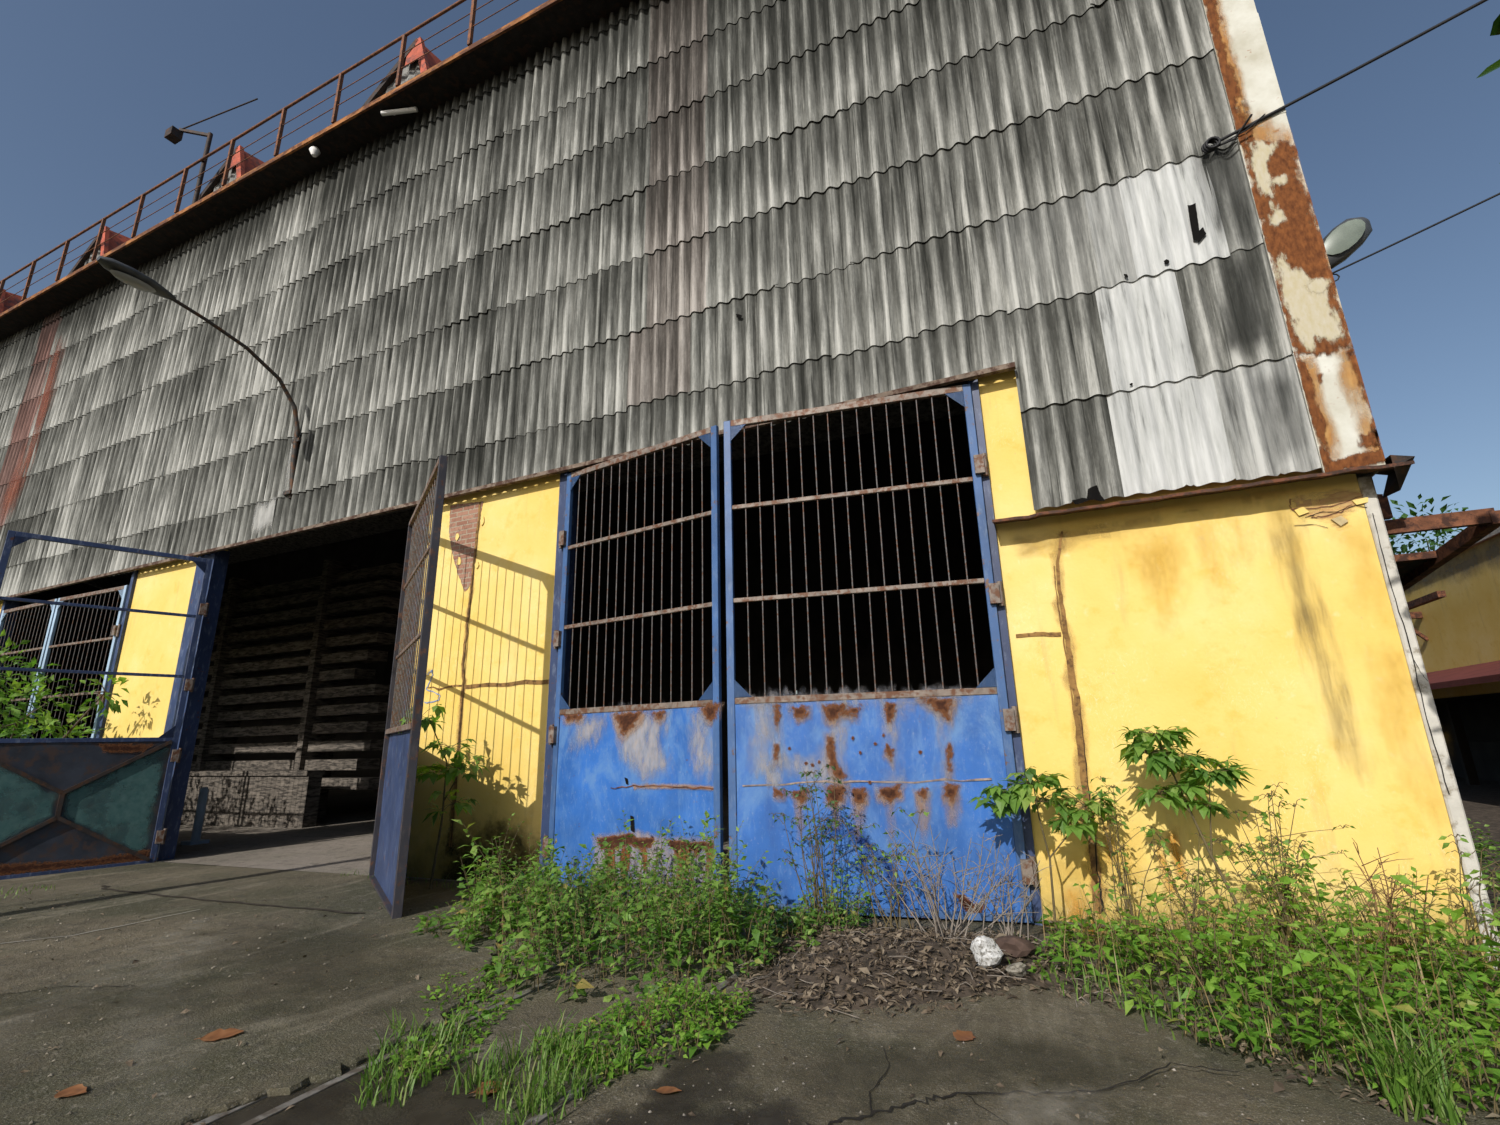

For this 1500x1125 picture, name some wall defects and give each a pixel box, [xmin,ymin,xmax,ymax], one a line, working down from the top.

peeling [1250,141,1287,225]
peeling [1275,254,1344,351]
corrosion [563,713,583,724]
corrosion [613,710,666,739]
corrosion [700,702,720,725]
corrosion [917,697,956,721]
corrosion [742,702,992,835]